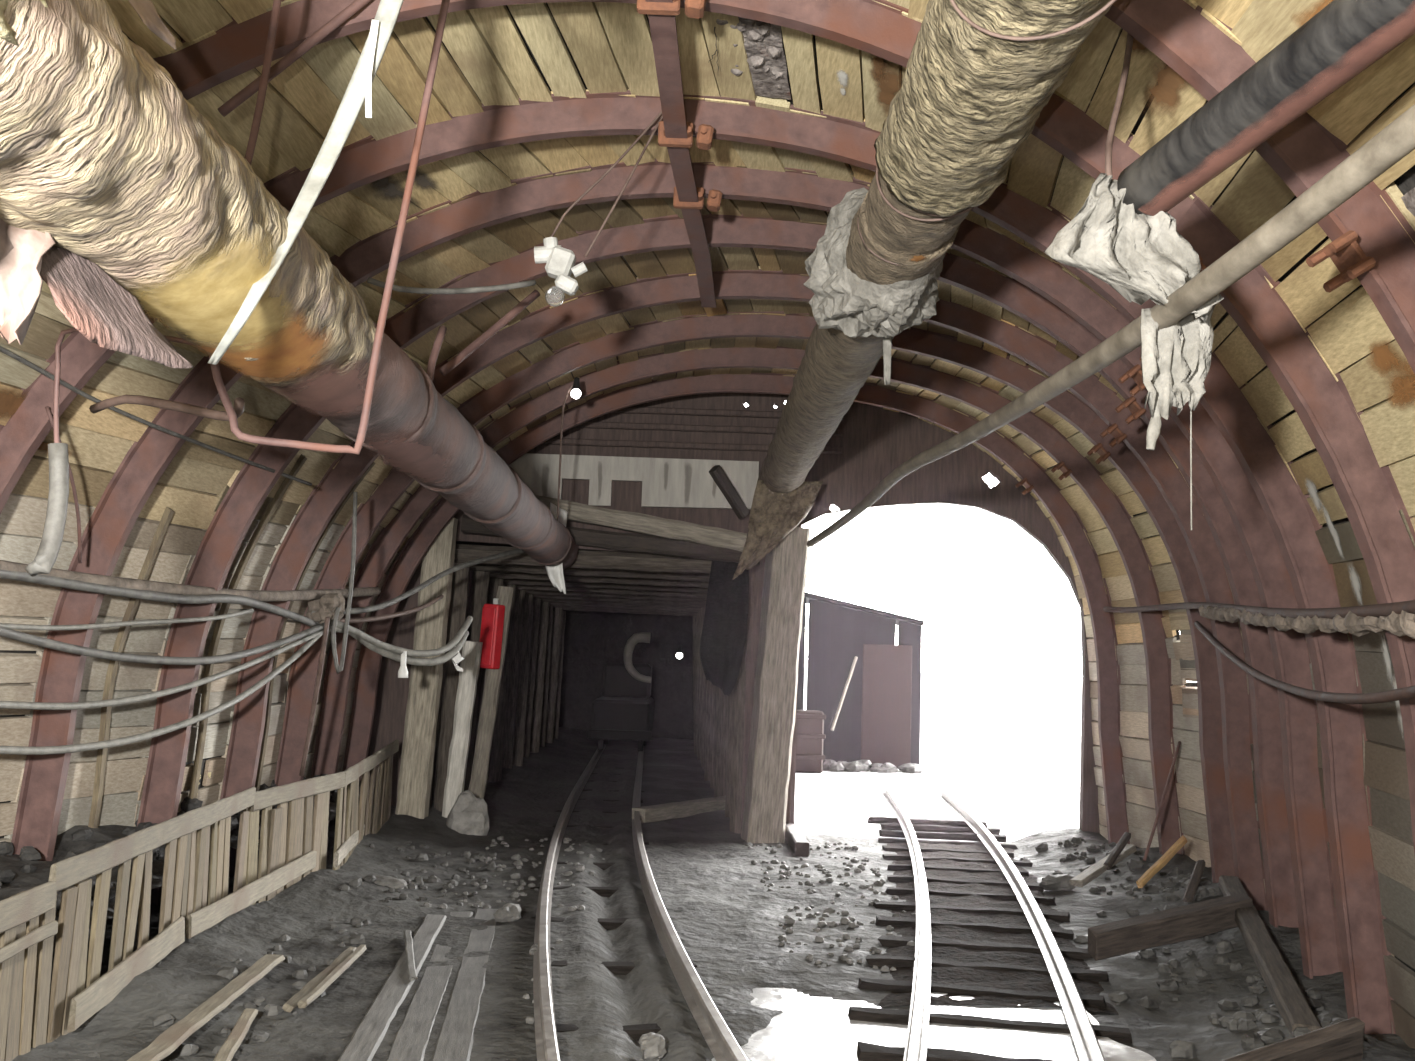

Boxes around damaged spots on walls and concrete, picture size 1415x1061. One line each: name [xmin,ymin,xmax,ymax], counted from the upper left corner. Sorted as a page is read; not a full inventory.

rust [1301,0,1333,26]
spalling [716,17,791,100]
rust [1139,6,1415,216]
spalling [1401,188,1415,217]
rust [1371,343,1415,406]